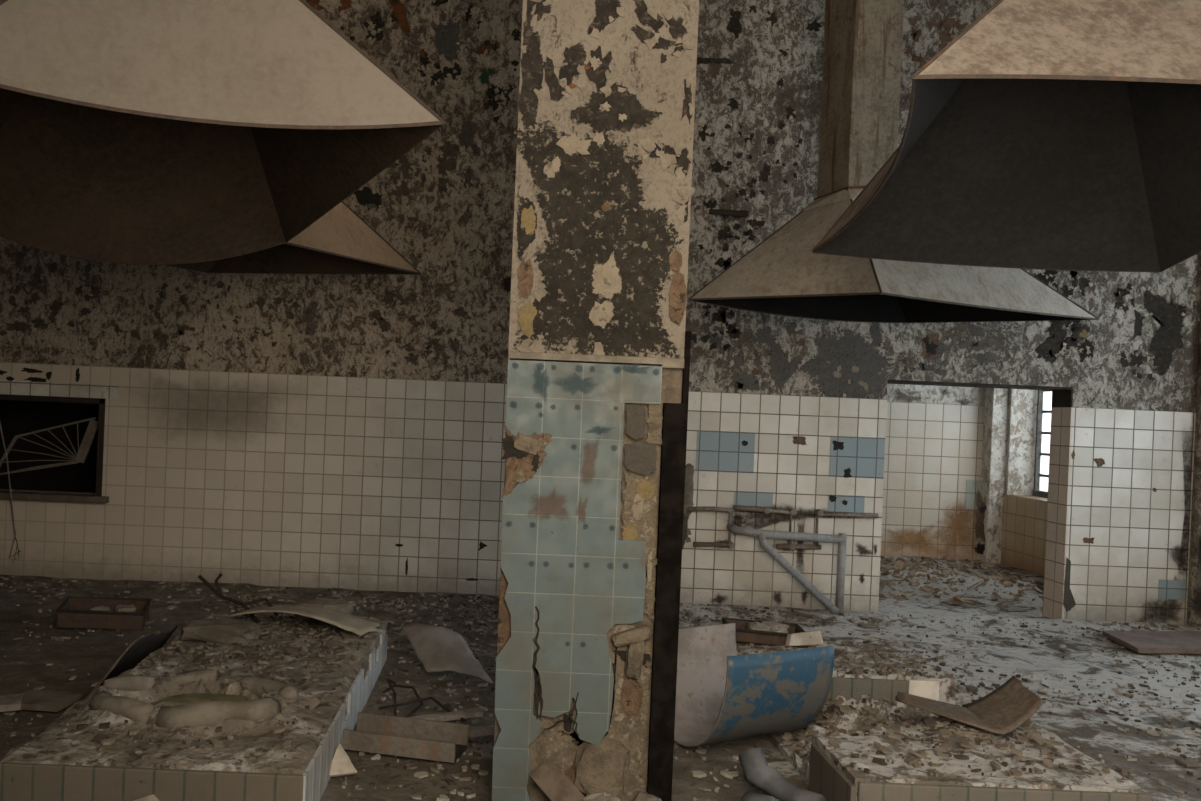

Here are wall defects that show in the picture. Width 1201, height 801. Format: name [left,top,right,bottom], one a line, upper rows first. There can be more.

peeling [417,0,482,86]
peeling [483,0,803,370]
peeling [1034,270,1093,297]
peeling [691,304,1013,405]
peeling [1035,320,1095,364]
peeling [1113,284,1187,380]
spalling [501,425,552,496]
flaking render [646,404,663,445]
leakage [1179,436,1201,575]
crack [532,606,579,736]
spalling [604,466,658,801]
spalling [532,701,587,797]